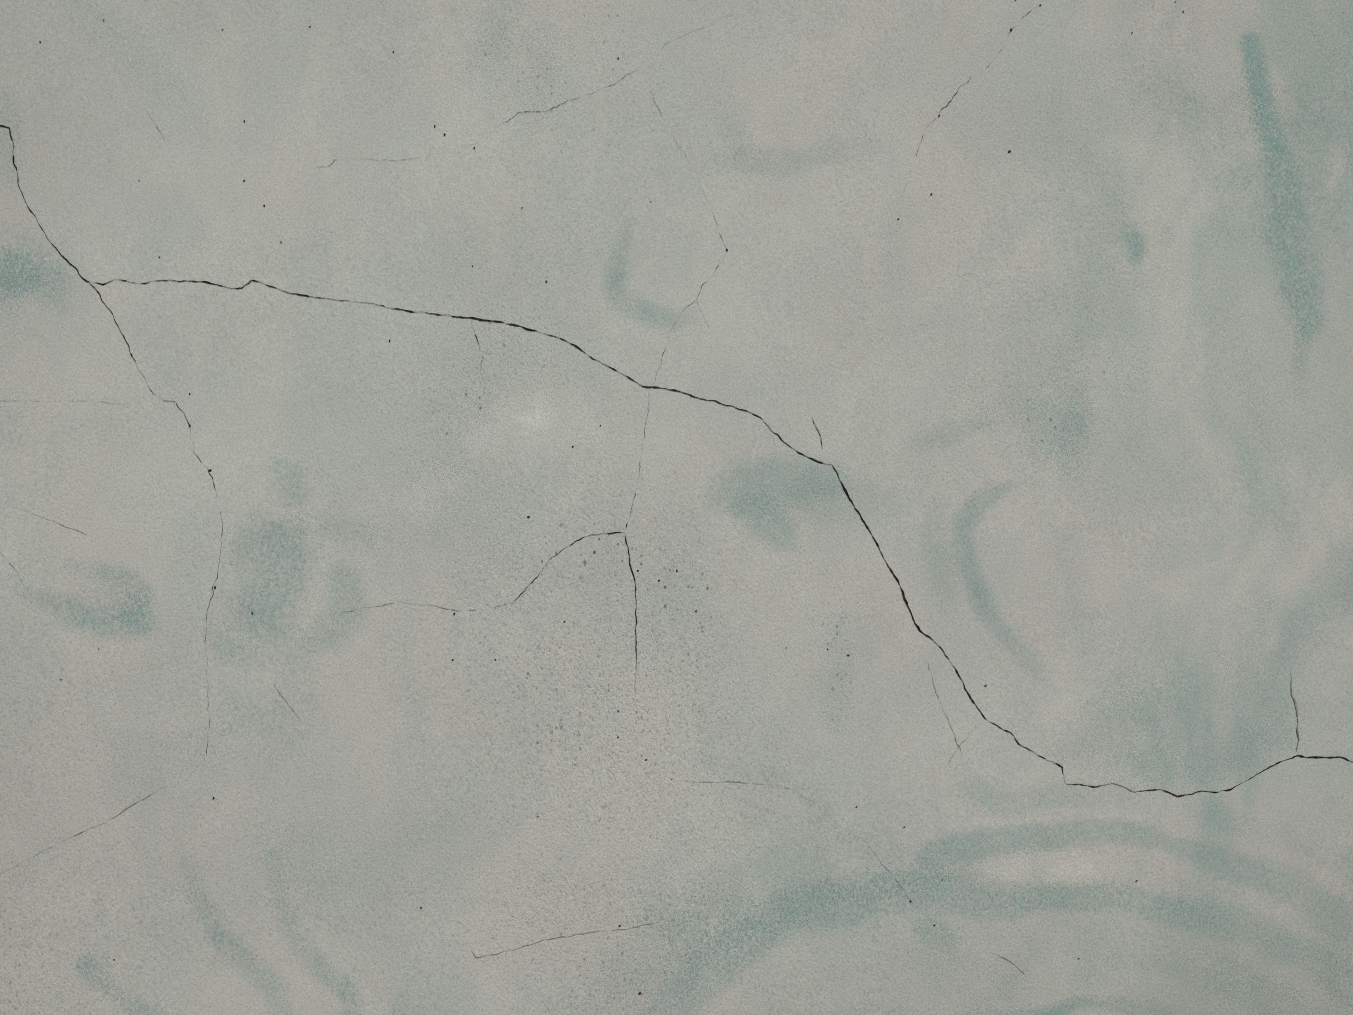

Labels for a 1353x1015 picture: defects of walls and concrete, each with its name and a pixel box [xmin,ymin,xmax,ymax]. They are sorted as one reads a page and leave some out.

crack [0,97,1352,797]